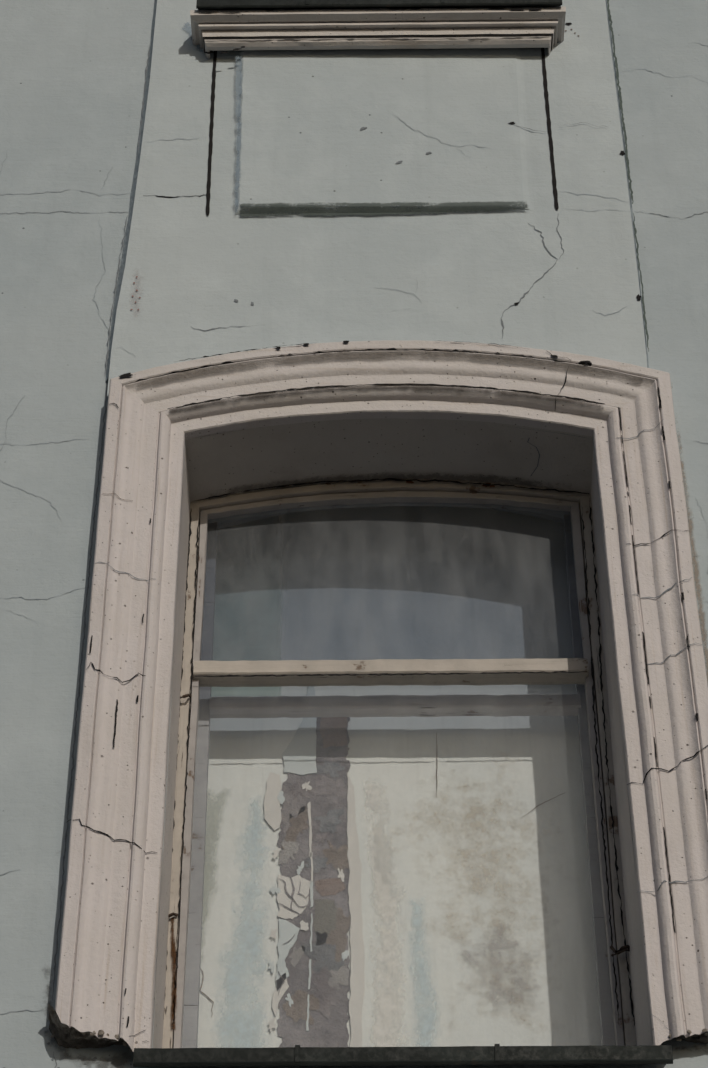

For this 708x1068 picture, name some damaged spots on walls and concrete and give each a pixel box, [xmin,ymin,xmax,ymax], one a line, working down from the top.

crack [0,151,708,600]
crack [7,562,153,621]
crack [88,635,146,747]
crack [641,632,702,709]
crack [627,737,708,785]
crack [67,819,157,853]
crack [636,827,708,933]
flaking render [48,1004,133,1052]
flaking render [669,1028,708,1044]